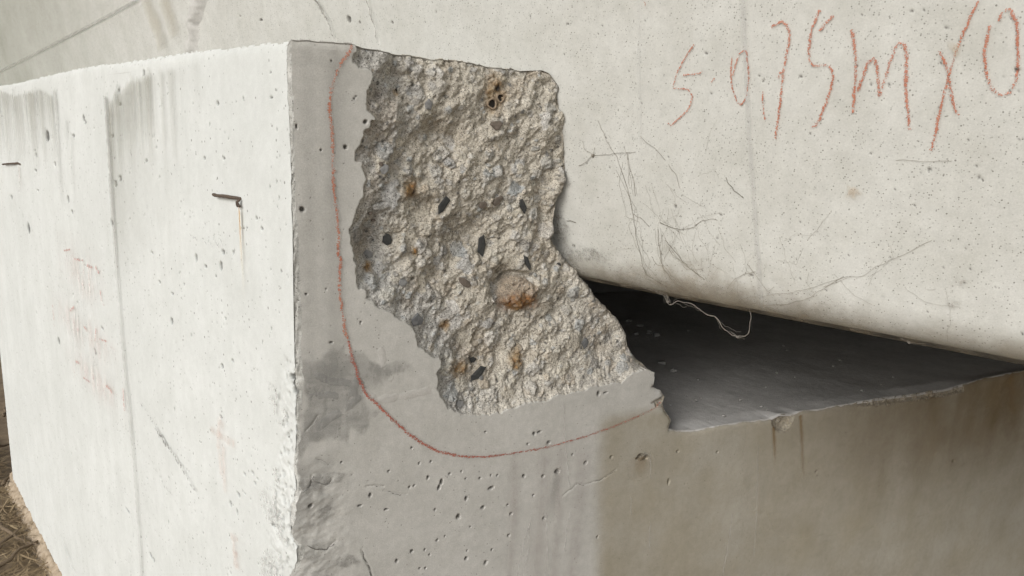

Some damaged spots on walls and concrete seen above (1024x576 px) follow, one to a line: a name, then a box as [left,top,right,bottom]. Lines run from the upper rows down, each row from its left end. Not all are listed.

spalling [349,48,651,416]